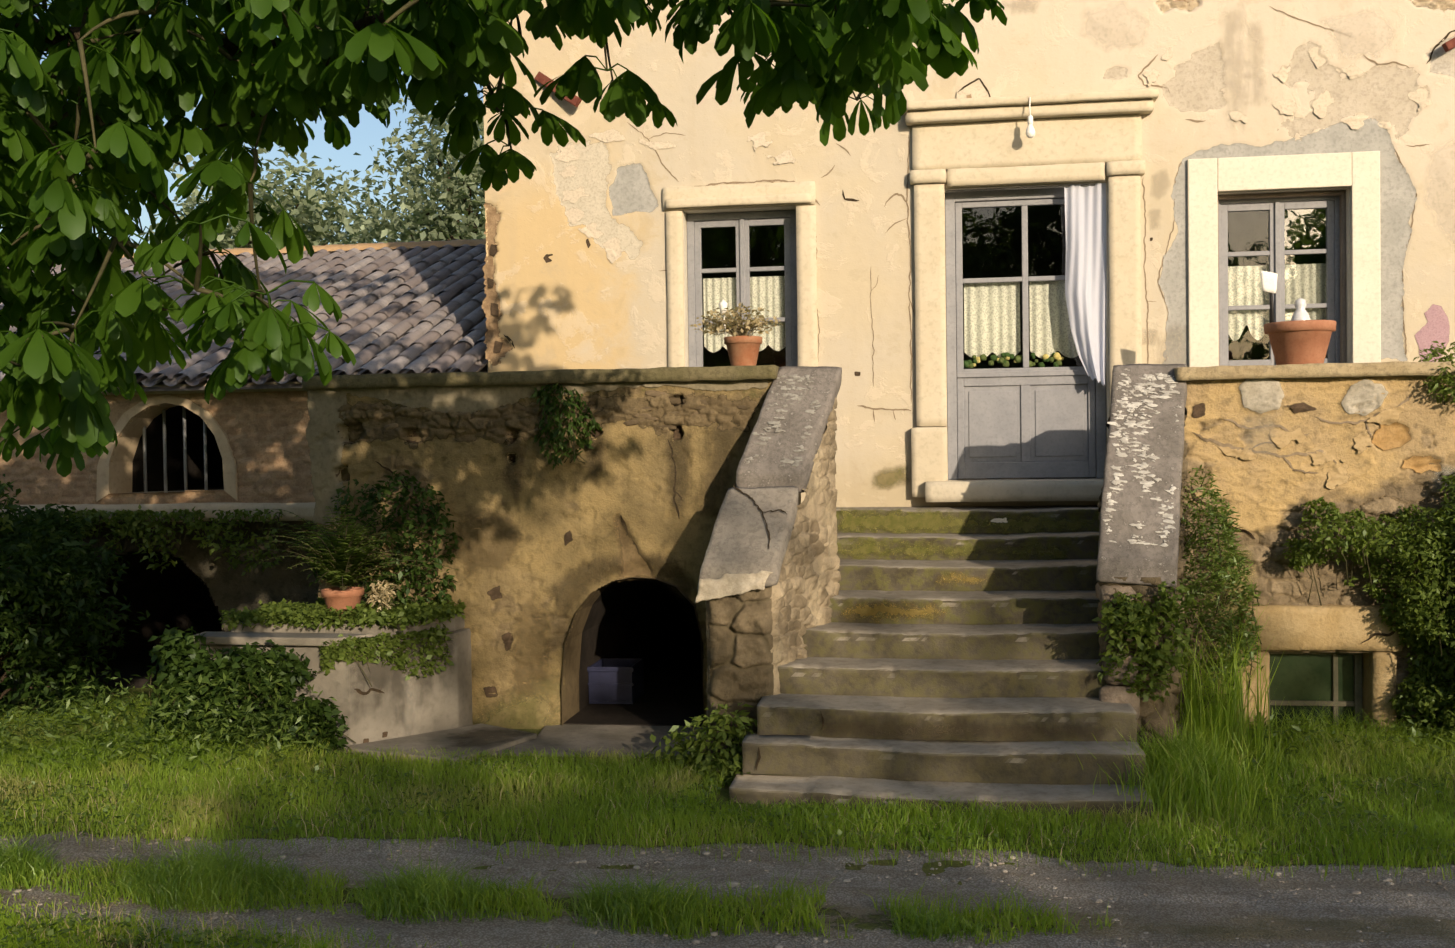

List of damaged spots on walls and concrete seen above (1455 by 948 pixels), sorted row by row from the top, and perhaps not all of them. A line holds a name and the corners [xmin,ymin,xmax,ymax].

spalling [1156,0,1200,13]
flaking render [1410,0,1455,11]
peeling [1103,42,1227,112]
peeling [1277,30,1455,141]
peeling [549,129,677,263]
spalling [482,203,515,366]
spalling [1193,403,1206,418]
peeling [1269,398,1442,489]
crack [734,487,786,549]